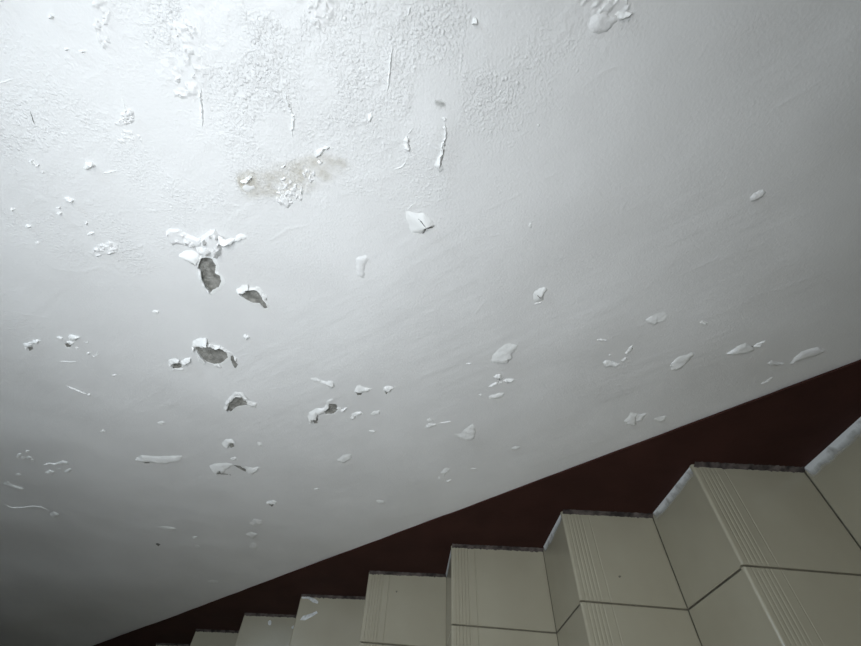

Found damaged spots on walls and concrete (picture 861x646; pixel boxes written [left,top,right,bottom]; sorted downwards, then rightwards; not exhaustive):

spalling [166,228,248,295]
spalling [236,284,269,310]
spalling [168,338,238,370]
peeling [491,343,517,363]
peeling [727,341,765,355]
spalling [224,391,257,413]
peeling [308,377,347,423]
peeling [135,455,182,464]
peeling [210,439,260,475]